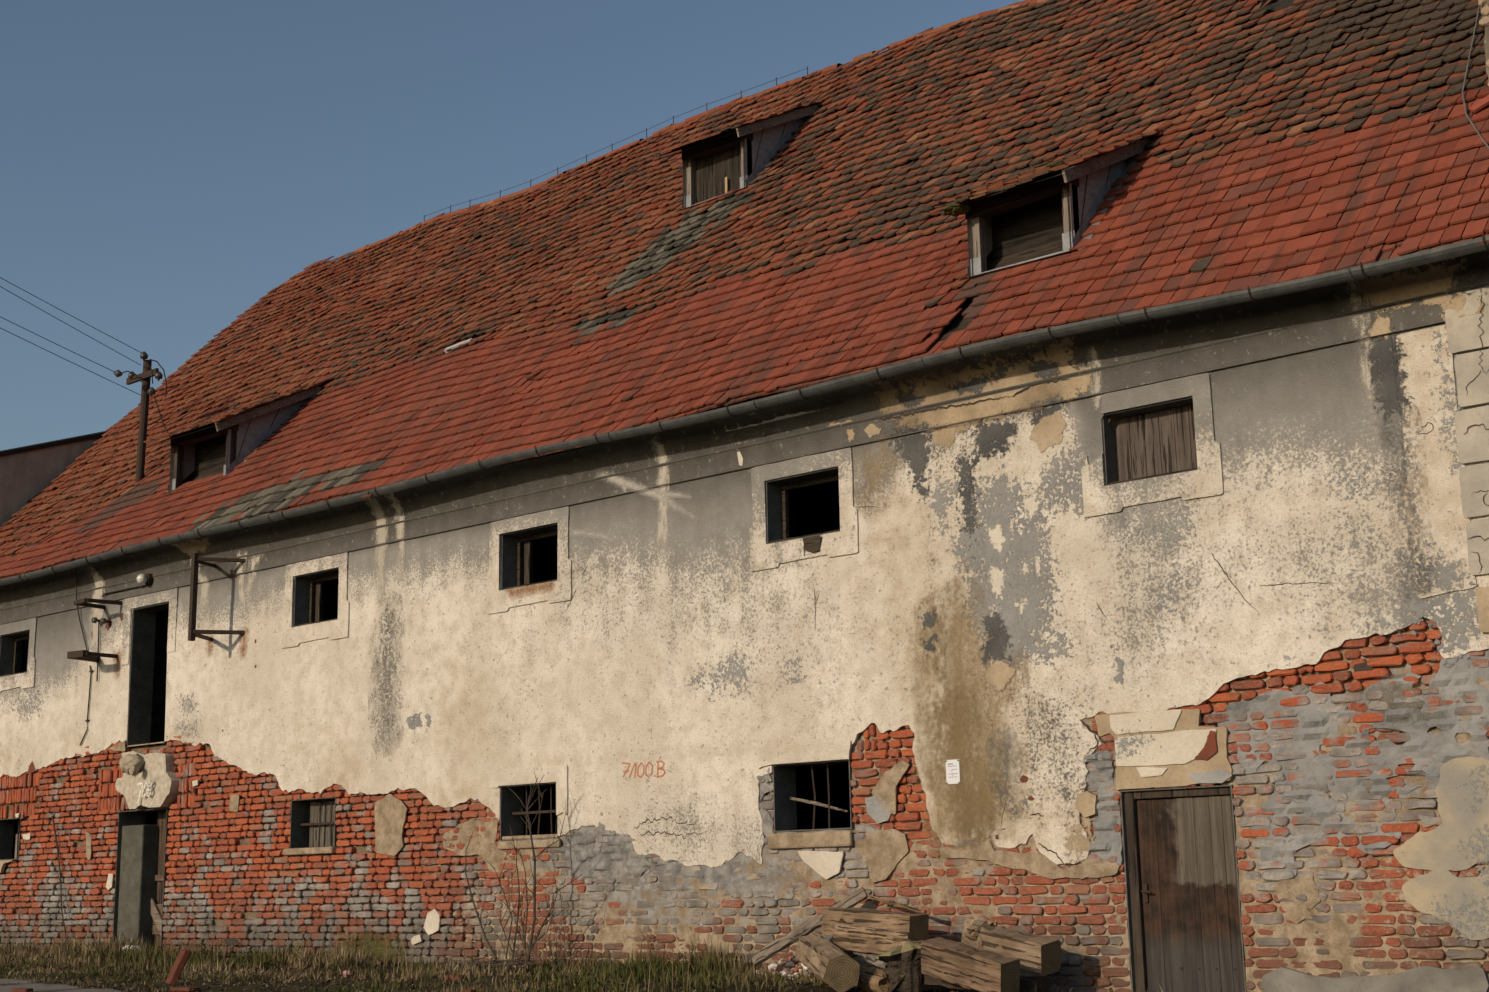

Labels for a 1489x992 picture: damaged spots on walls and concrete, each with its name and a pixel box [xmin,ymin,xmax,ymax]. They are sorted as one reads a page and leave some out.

crack [1418,294,1489,434]
damp [367,493,405,752]
spalling [0,454,1489,992]
damp [917,611,1029,837]
peeling [828,336,1201,696]
crack [1468,490,1489,574]